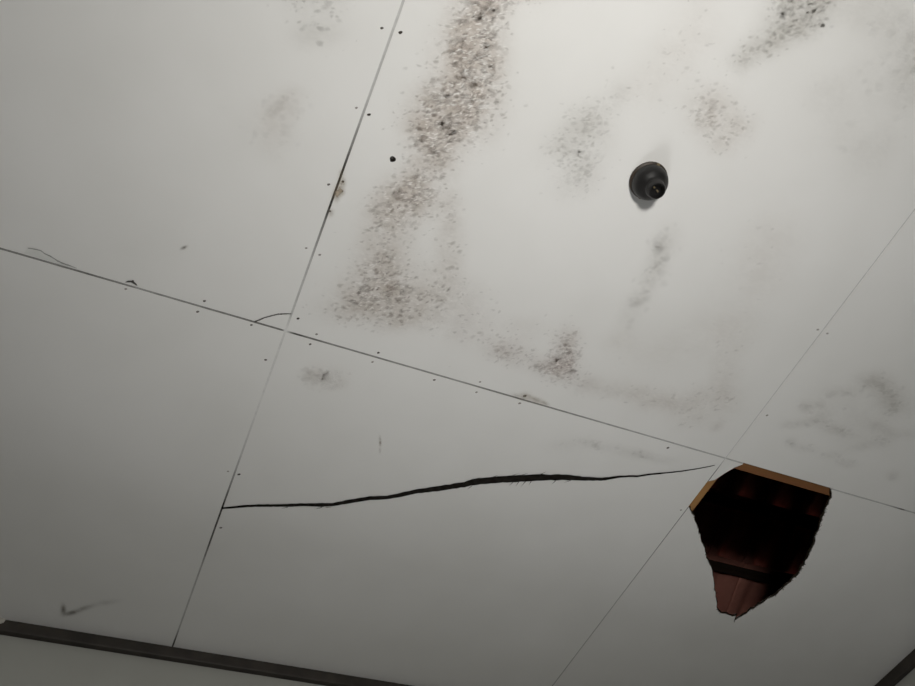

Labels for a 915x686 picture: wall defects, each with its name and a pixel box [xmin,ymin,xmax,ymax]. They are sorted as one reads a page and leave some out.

leakage [322,0,531,328]
crack [221,465,715,509]
spalling [689,489,832,622]